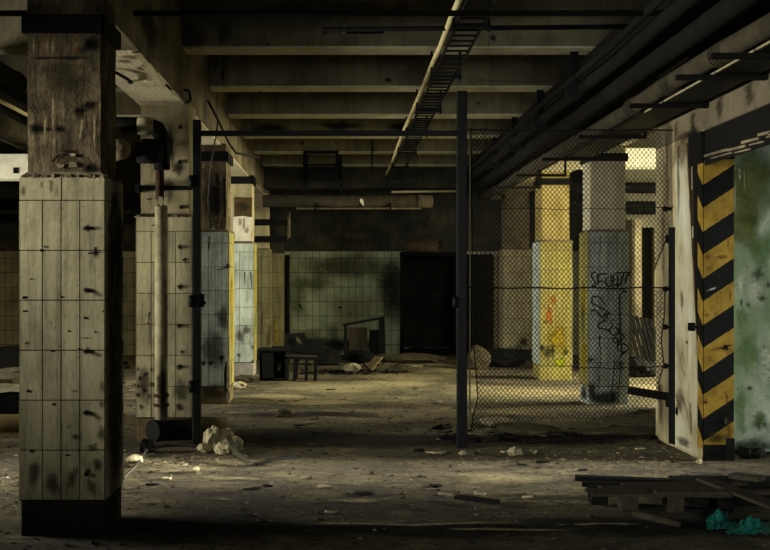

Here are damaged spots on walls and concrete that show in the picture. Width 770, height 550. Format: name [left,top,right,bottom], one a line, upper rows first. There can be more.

spalling [51,150,96,173]
damp [753,411,766,428]